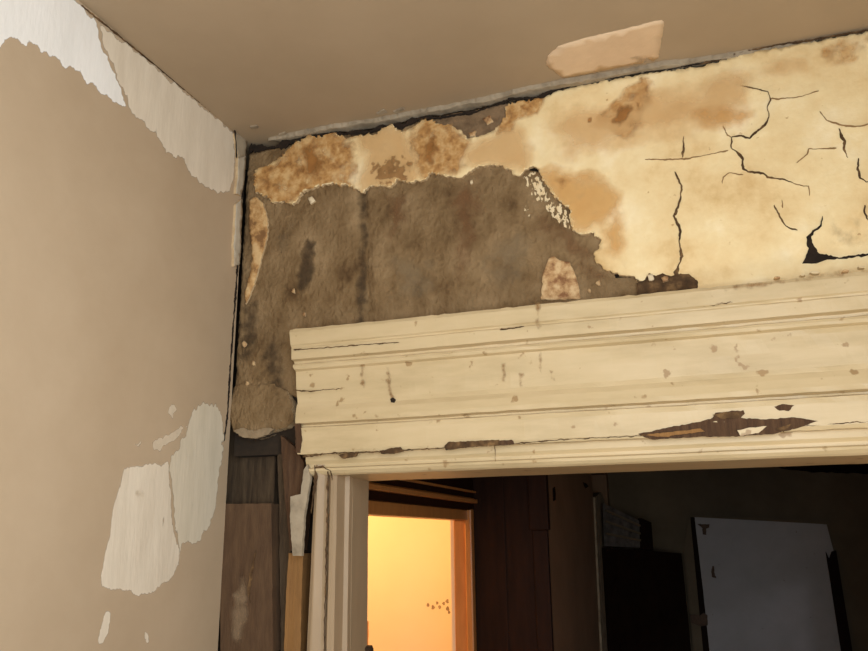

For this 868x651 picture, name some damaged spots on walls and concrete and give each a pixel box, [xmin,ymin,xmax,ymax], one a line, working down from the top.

peeling [0,0,235,194]
damp [361,128,414,190]
spalling [236,20,815,398]
damp [566,80,745,144]
crack [645,85,868,275]
peeling [101,402,224,596]
peeling [294,423,302,453]
peeling [639,404,816,440]